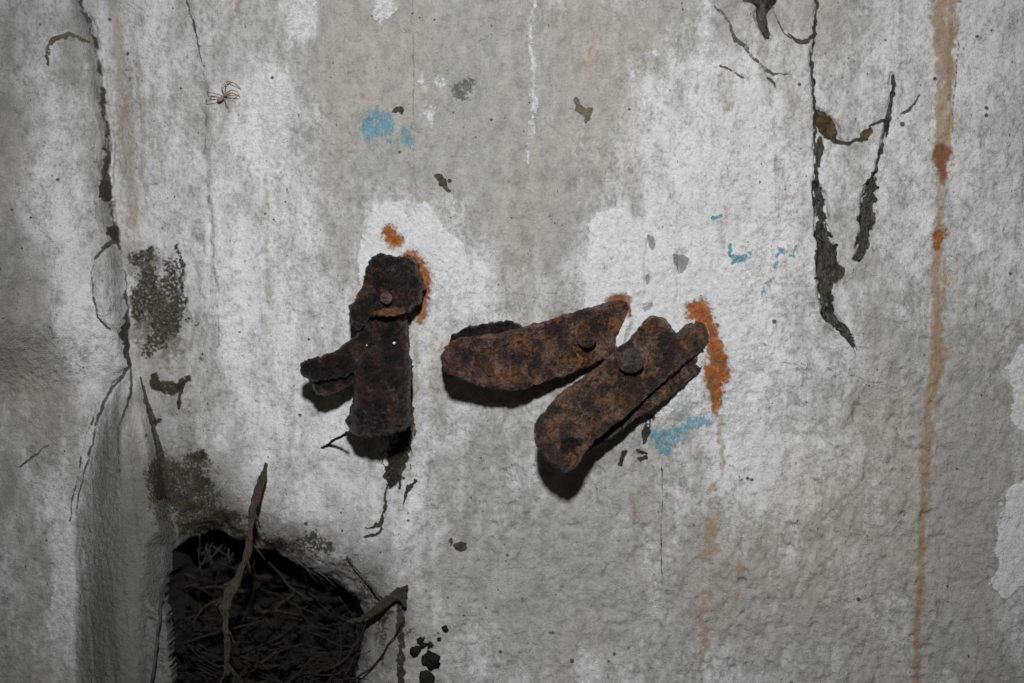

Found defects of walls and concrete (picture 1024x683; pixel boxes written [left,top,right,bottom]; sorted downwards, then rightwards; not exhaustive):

crack [714,0,920,351]
crack [69,0,169,521]
mould [128,243,199,363]
corrosion [376,223,431,324]
corrosion [606,294,632,317]
corrosion [685,295,731,414]
corrosion [921,0,961,513]
corrosion [560,436,584,454]
water stain [143,448,387,654]